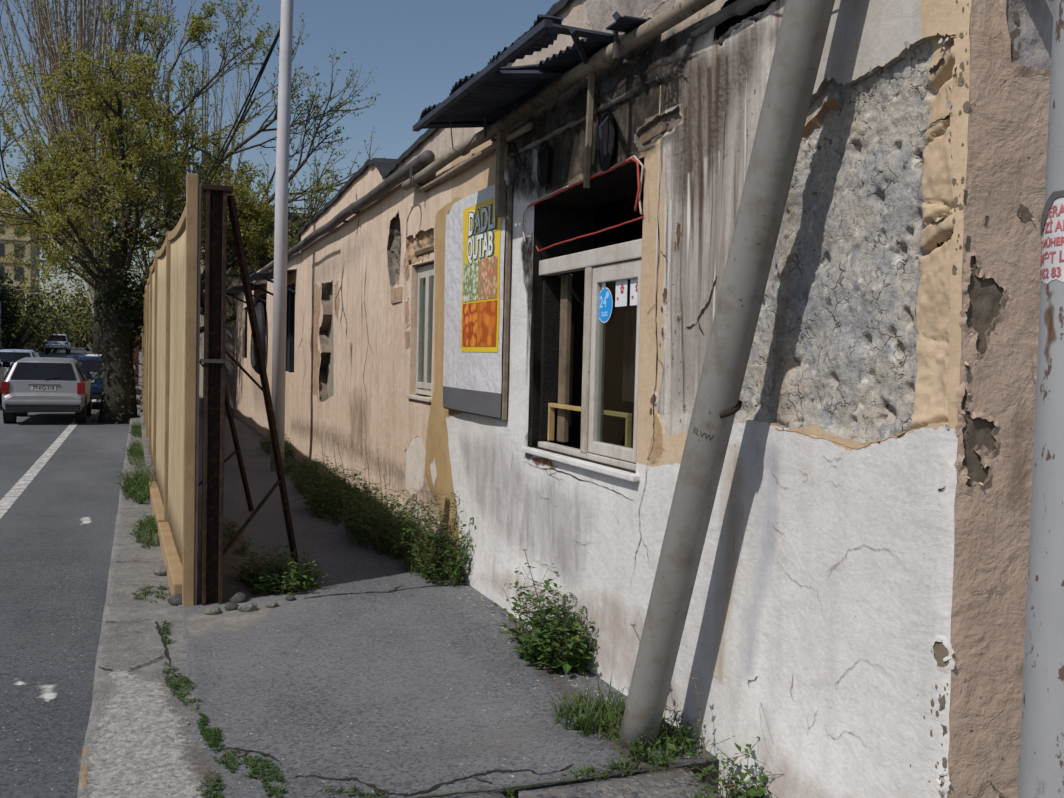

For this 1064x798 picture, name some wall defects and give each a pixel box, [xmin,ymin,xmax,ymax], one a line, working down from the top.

peeling [999,0,1054,76]
spalling [387,211,434,349]
damp [655,175,689,292]
damp [677,56,747,354]
spalling [733,31,1009,496]
peeling [1017,204,1035,221]
crack [510,146,669,586]
crack [306,584,469,598]
crack [780,546,898,612]
crack [210,747,620,798]
peeling [923,635,955,798]